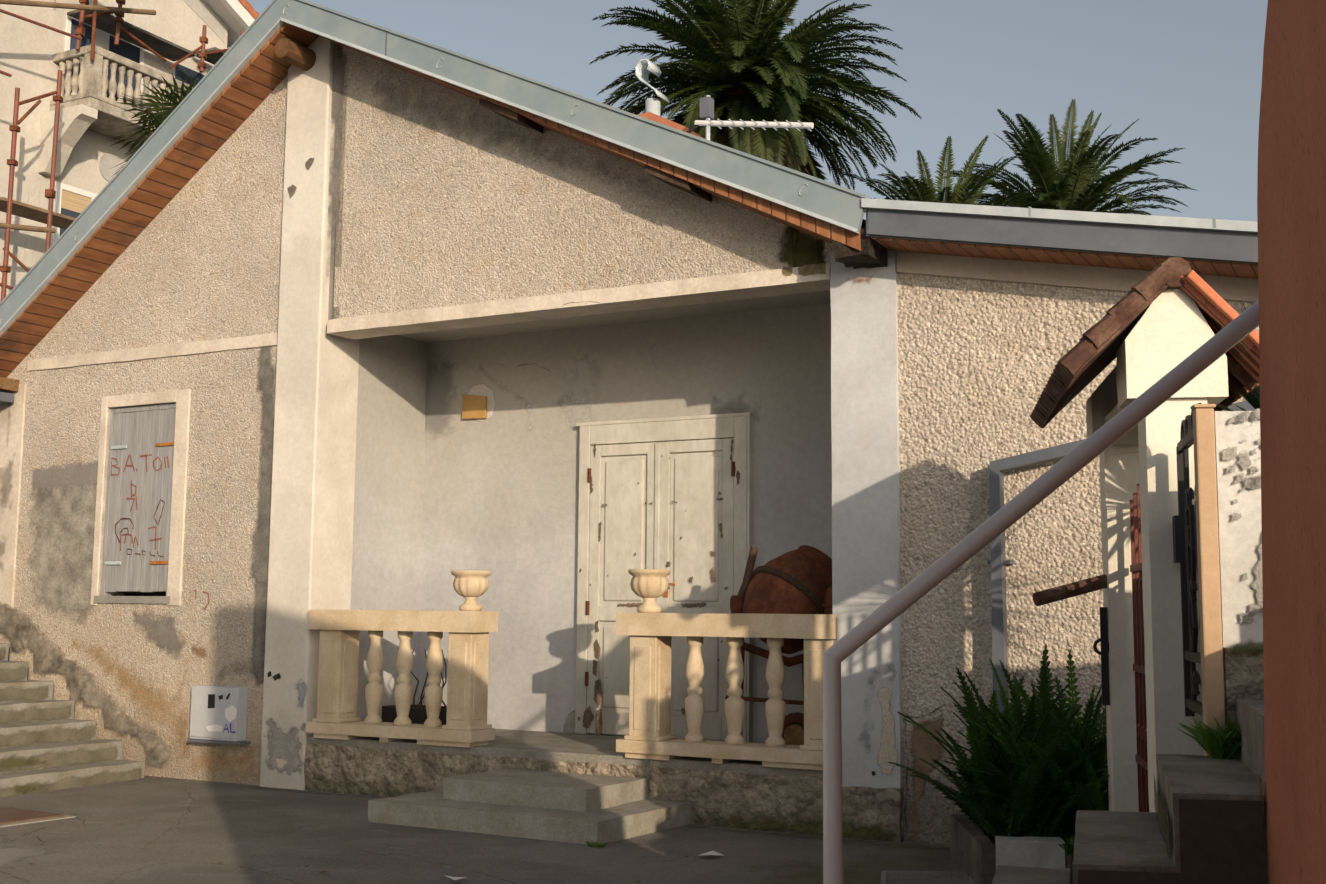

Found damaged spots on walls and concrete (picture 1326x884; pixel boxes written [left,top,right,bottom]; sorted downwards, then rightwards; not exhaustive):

peeling [1229,409,1260,425]
peeling [1222,439,1261,521]
flaking render [29,463,98,624]
peeling [1240,543,1263,624]
flaking render [0,603,170,767]
peeling [266,718,306,775]
flaking render [862,666,943,840]